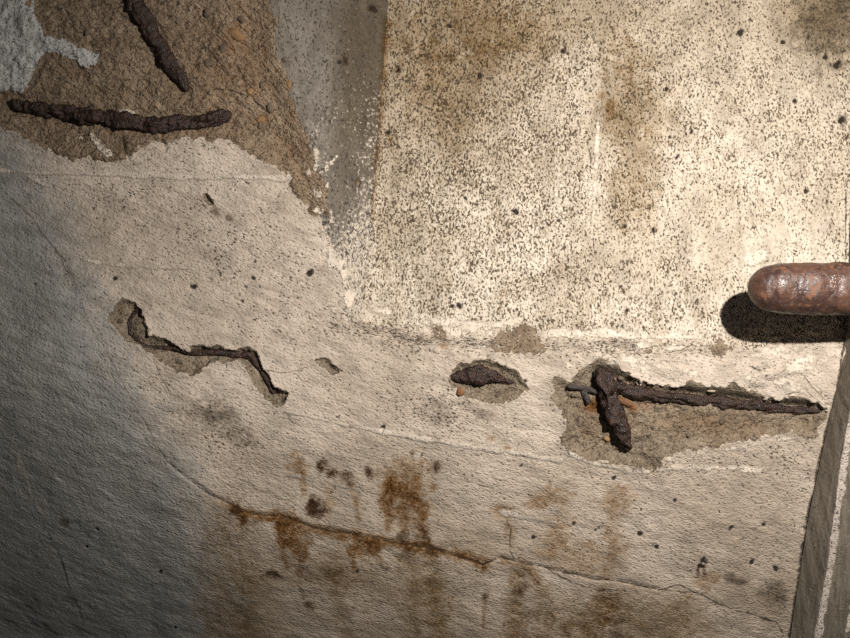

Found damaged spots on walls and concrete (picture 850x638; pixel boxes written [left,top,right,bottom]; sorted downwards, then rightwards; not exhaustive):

spalling [0,0,338,230]
spalling [107,297,289,408]
spalling [409,313,829,475]
rust [306,499,325,515]
crack [161,336,845,636]